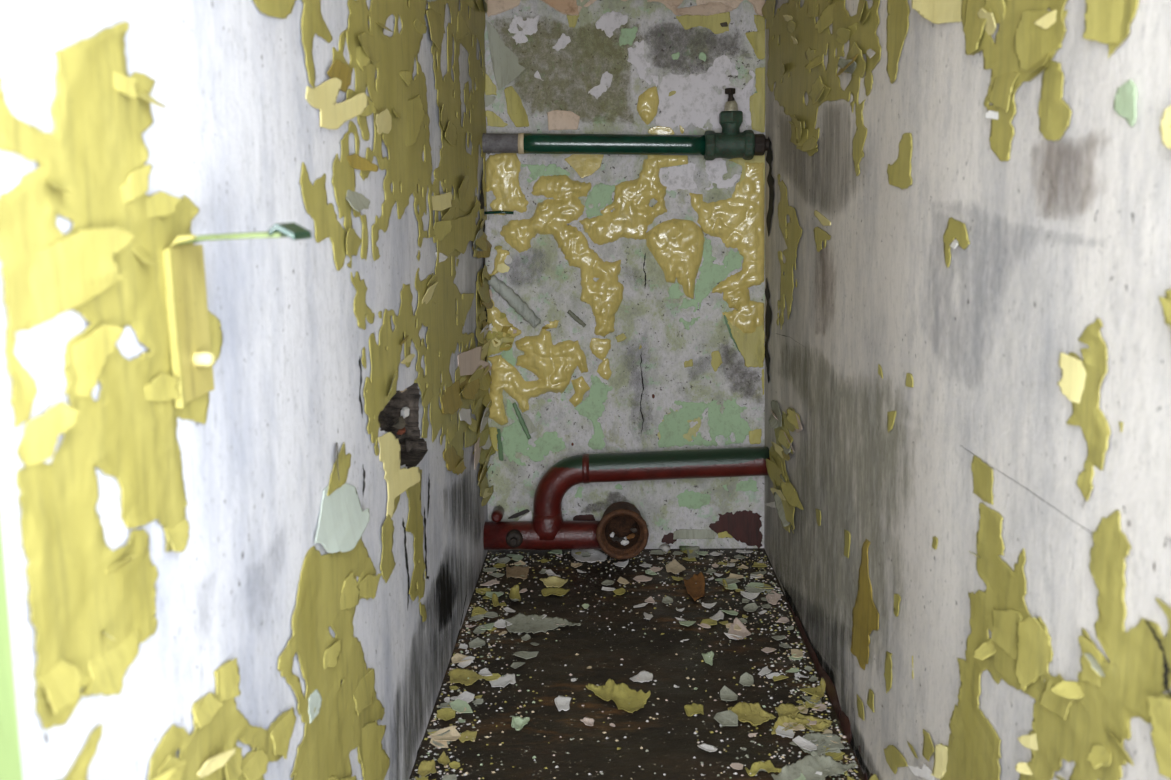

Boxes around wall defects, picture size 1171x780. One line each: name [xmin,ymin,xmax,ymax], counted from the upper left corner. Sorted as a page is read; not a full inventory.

leakage [501,19,639,122]
leakage [652,27,749,79]
peeling [1082,0,1139,57]
peeling [659,154,831,329]
peeling [887,133,913,189]
peeling [0,22,209,729]
peeling [148,0,596,780]
crack [638,352,646,432]
peeling [1057,318,1124,501]
peeling [601,531,845,780]
peeling [884,455,1171,780]
peeling [64,724,103,780]